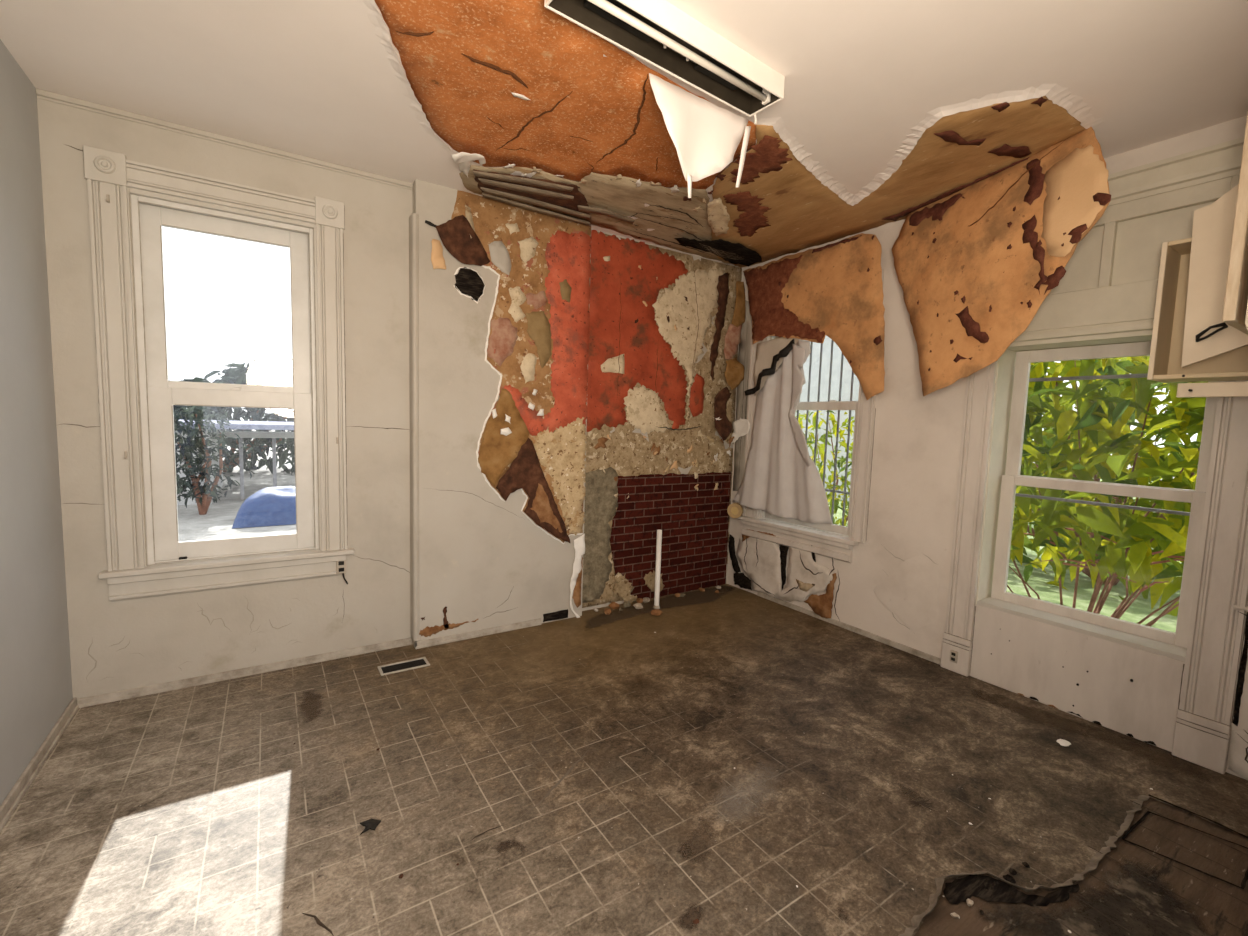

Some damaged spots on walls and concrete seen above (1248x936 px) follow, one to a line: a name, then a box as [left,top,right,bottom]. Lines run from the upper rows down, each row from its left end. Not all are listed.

peeling [362,0,756,622]